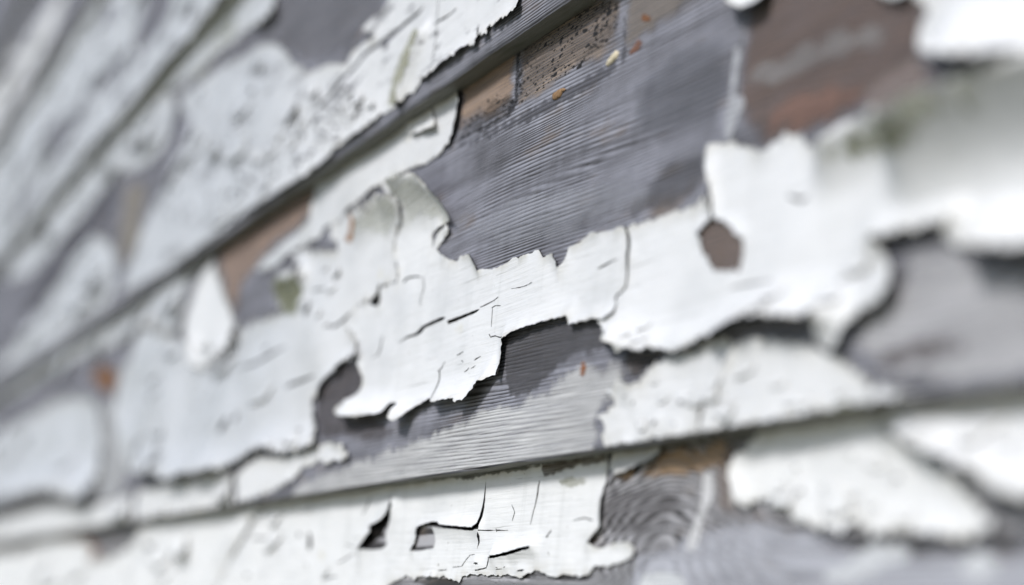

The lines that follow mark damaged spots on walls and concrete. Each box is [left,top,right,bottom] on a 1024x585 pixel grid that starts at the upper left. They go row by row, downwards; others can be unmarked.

peeling [598,0,1024,354]
peeling [0,90,627,541]
crack [597,226,630,301]
peeling [0,446,662,585]
crack [412,481,593,571]